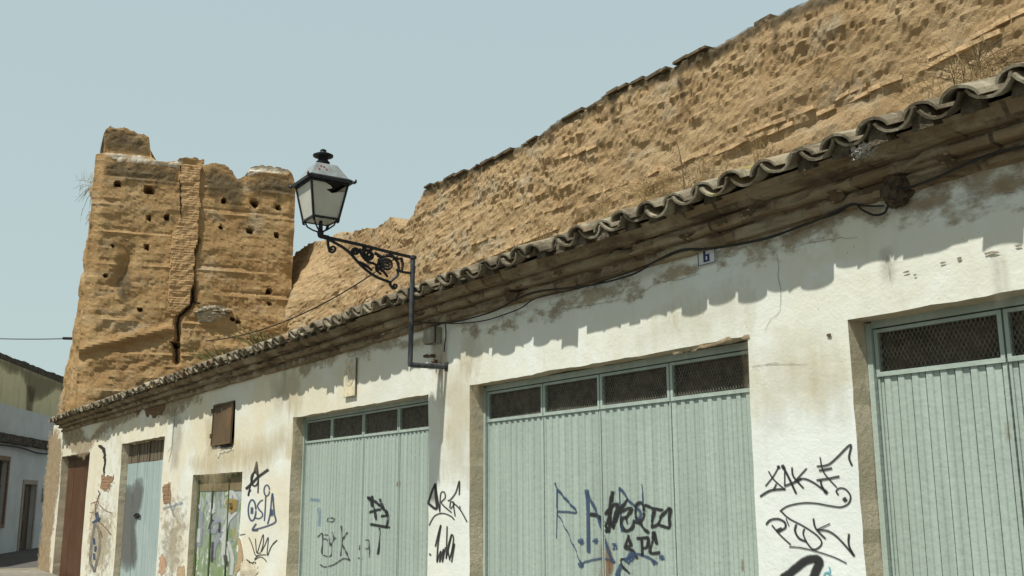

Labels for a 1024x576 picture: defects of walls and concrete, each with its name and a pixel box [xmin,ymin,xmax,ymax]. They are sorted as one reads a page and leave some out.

crack [169,287,200,363]
spalling [37,396,201,576]